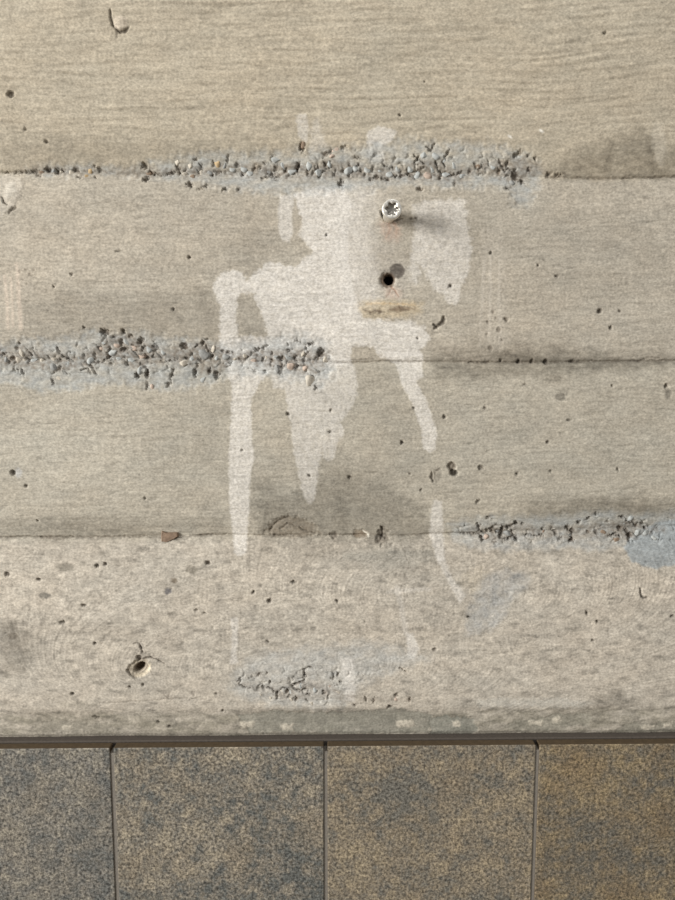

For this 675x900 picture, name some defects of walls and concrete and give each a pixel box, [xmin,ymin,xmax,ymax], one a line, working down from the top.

water stain [275,195,296,244]
water stain [322,187,429,318]
water stain [0,356,467,638]